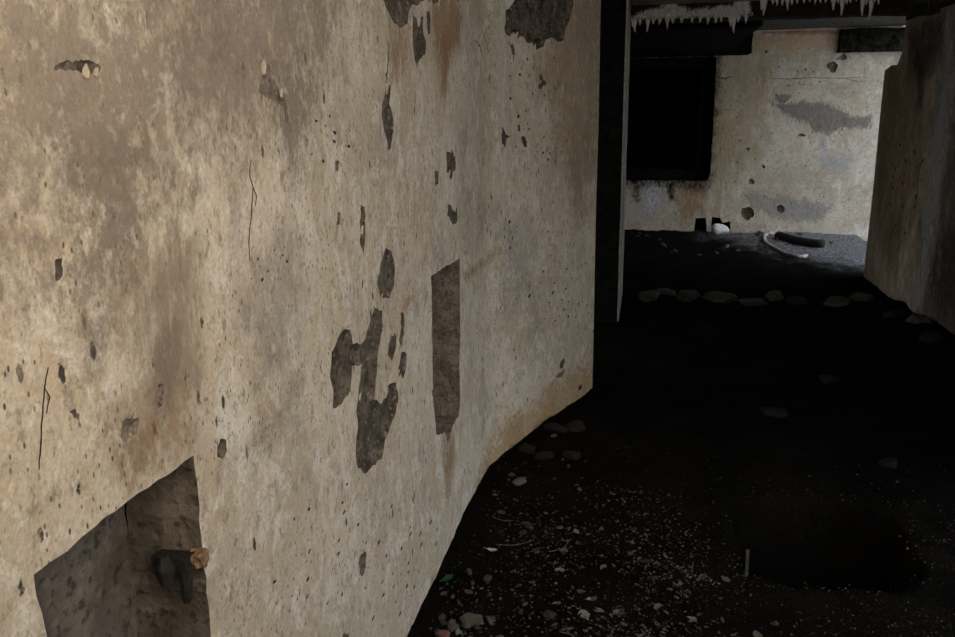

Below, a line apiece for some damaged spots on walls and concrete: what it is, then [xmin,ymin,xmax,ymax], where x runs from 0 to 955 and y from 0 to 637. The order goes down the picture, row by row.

peeling [384,0,440,67]
peeling [504,0,574,77]
water stain [631,1,753,19]
spalling [382,85,396,151]
spalling [360,205,368,255]
peeling [741,171,833,223]
spalling [330,248,407,473]